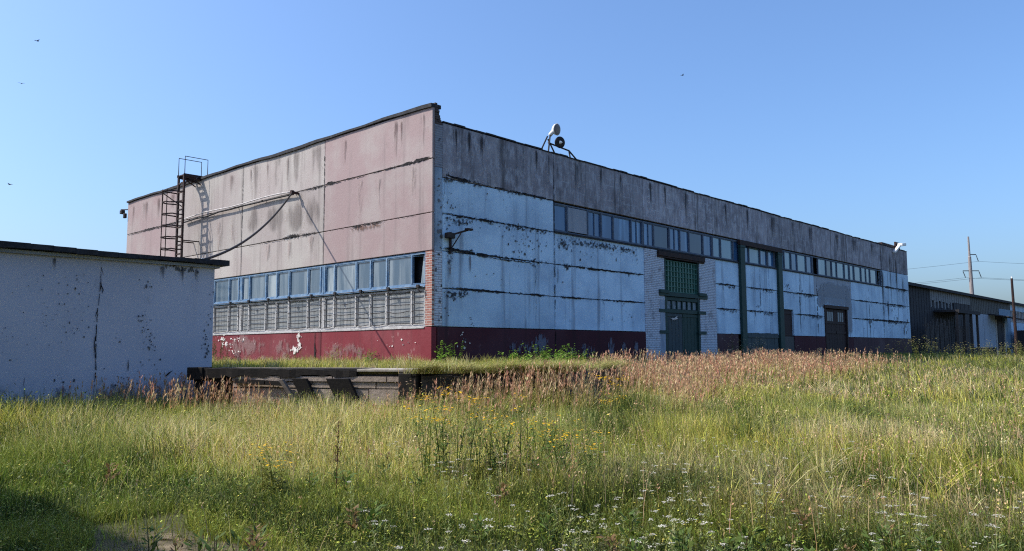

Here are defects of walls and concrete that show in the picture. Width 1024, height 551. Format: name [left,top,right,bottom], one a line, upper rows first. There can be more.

crack [94,261,104,386]
peeling [203,292,260,358]
flaking render [277,331,302,358]